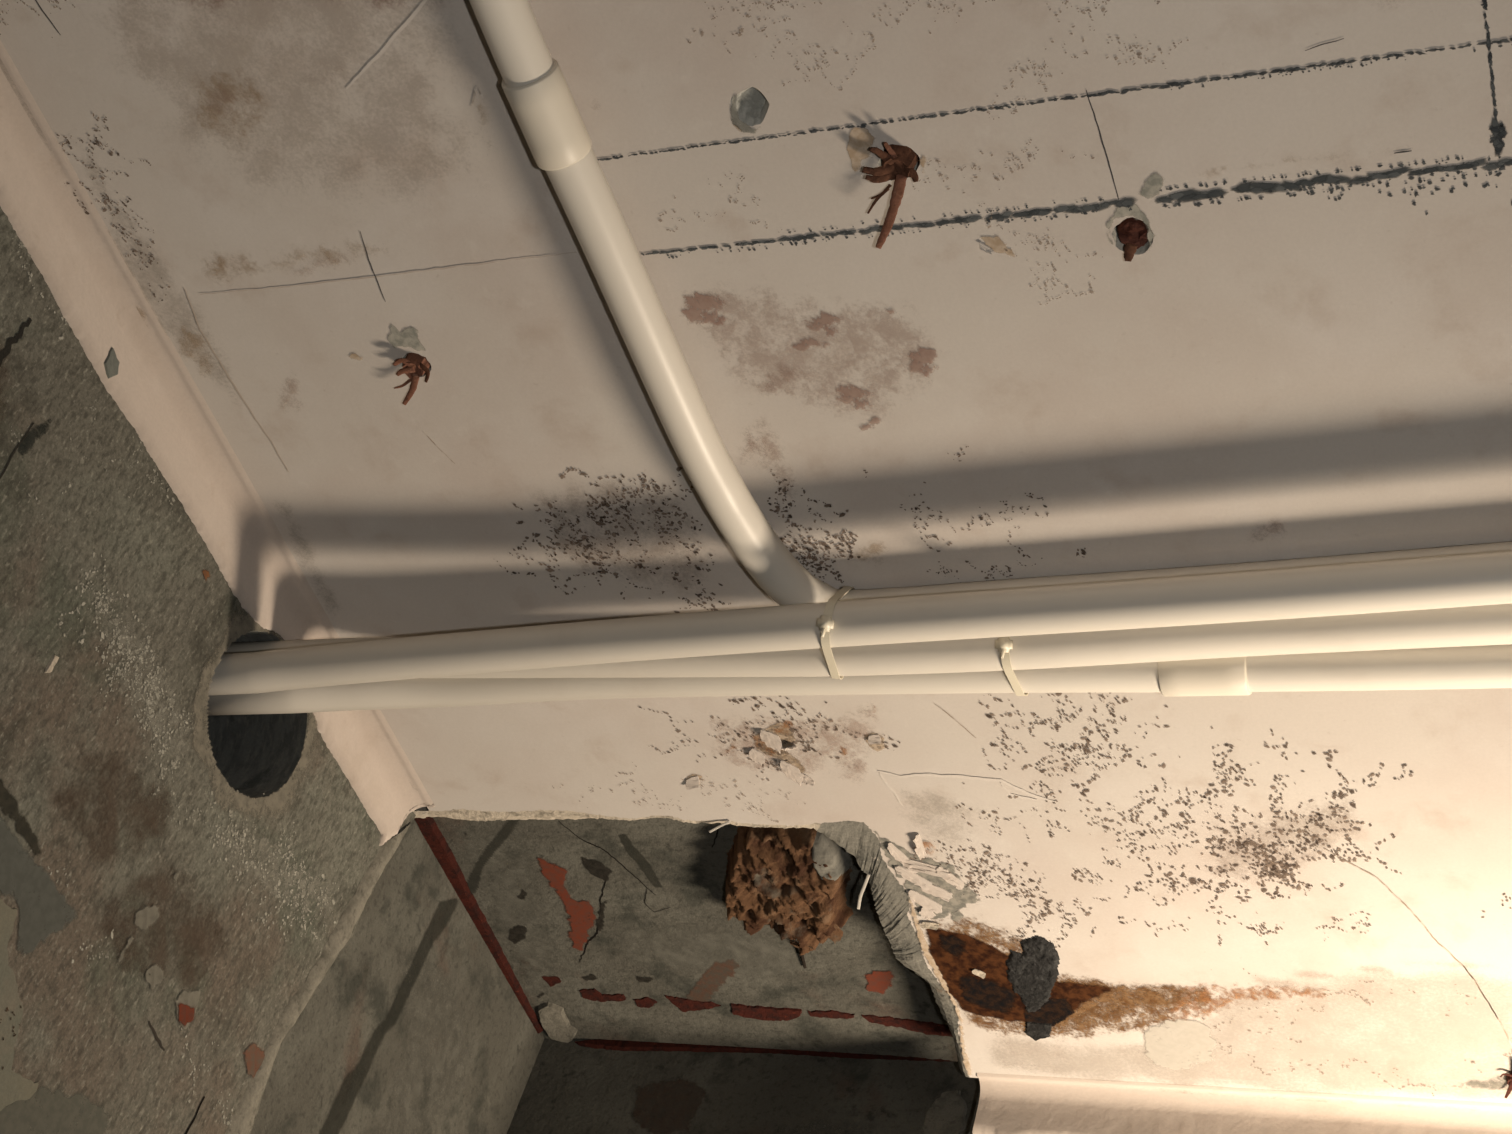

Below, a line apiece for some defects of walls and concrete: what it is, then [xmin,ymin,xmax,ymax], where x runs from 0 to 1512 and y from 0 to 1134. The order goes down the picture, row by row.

crack [0,318,32,367]
leakage [682,292,725,325]
leakage [793,313,840,351]
leakage [910,348,936,377]
leakage [837,386,880,430]
crack [0,423,34,479]
leakage [497,467,731,613]
leakage [579,696,901,823]
leakage [911,693,1414,1035]
spalling [413,807,980,1077]
corrosion [1171,985,1321,1020]
leakage [1049,975,1436,1096]